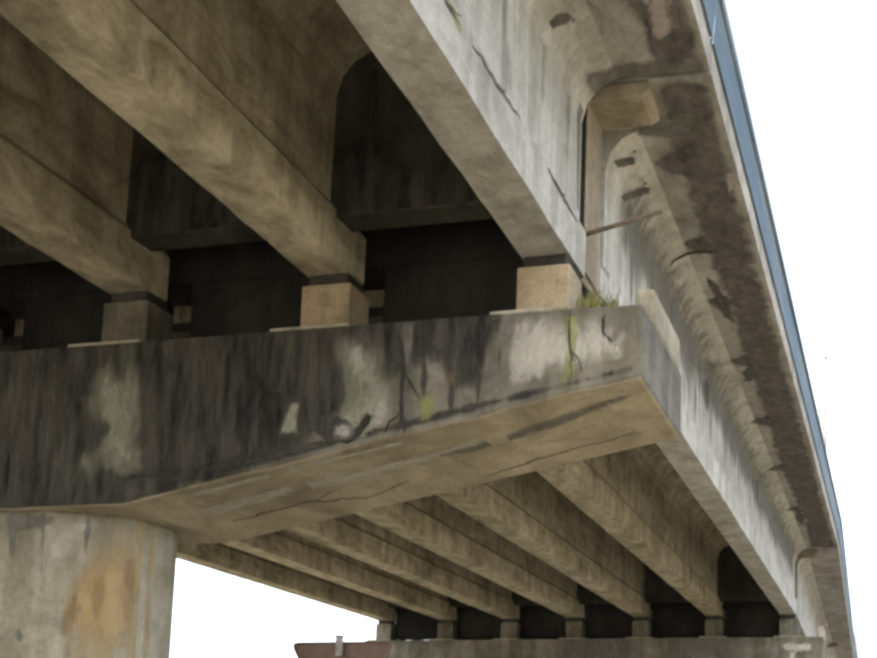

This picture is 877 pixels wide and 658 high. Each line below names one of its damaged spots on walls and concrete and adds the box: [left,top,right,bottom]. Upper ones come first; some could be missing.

spalling [550,13,575,28]
damp [587,0,833,574]
damp [0,314,544,560]
crack [384,333,420,433]
damp [513,322,617,385]
damp [506,396,626,441]
crack [235,481,408,521]
rust [75,550,134,646]